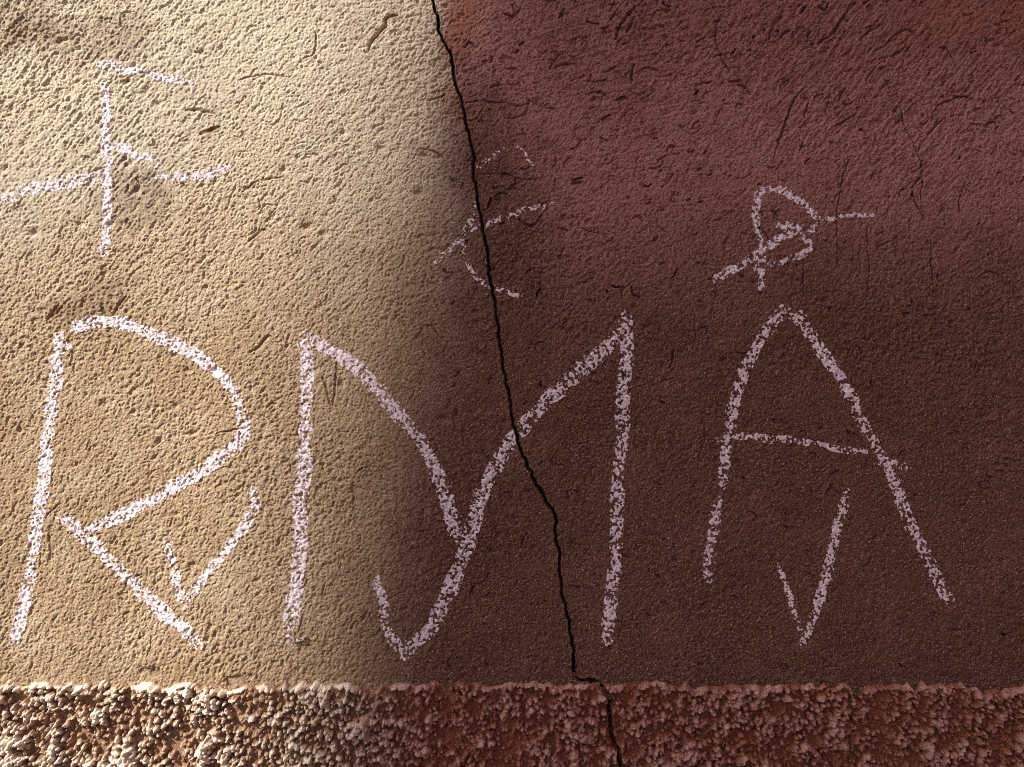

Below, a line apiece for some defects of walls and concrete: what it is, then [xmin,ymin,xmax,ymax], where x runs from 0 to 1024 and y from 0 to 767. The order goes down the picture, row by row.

crack [431,0,621,767]